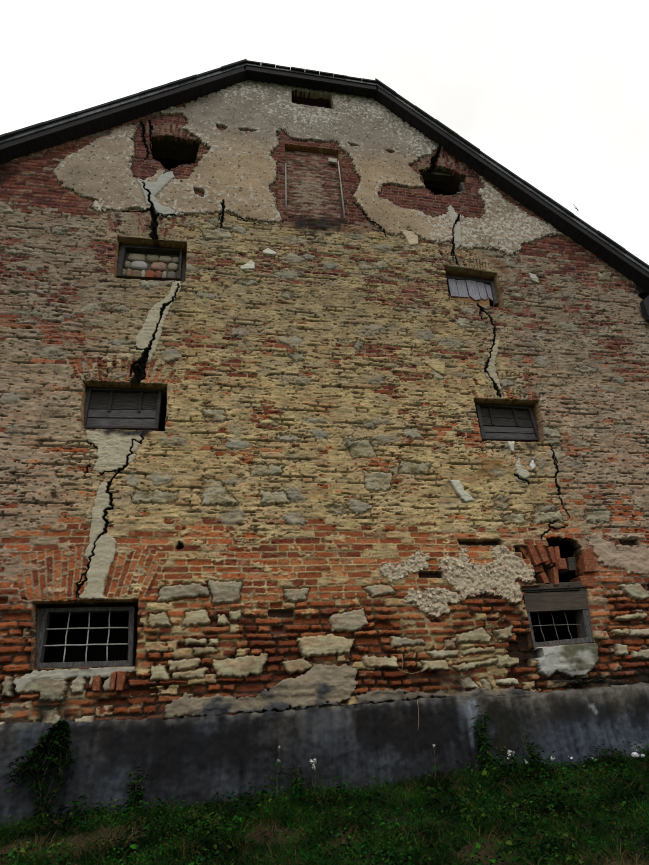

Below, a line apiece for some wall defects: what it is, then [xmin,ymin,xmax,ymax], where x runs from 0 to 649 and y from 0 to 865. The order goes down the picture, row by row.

crack [123,171,176,251]
spalling [130,113,211,197]
spalling [269,129,383,235]
spalling [378,146,486,219]
crack [130,283,180,387]
crack [477,303,501,397]
crack [76,435,144,598]
crack [541,444,570,539]
spalling [378,536,583,621]
water stain [37,698,66,720]
water stain [88,712,259,776]
water stain [313,696,519,756]